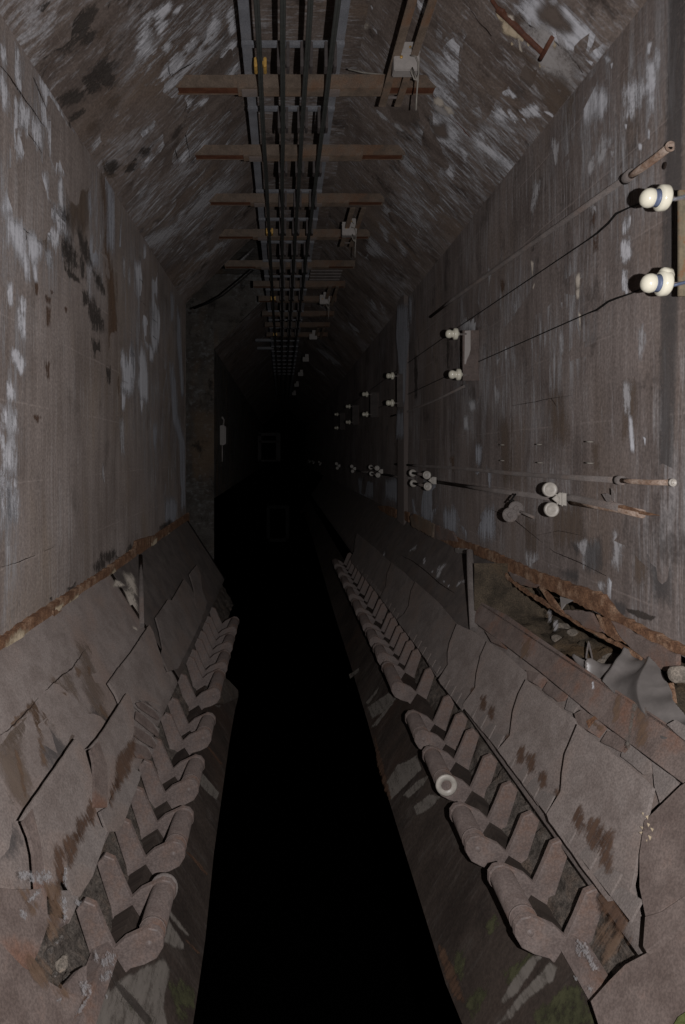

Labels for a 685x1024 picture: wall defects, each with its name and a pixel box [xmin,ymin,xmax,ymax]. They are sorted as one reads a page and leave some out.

damp [514,0,613,69]
damp [354,38,554,258]
damp [574,87,625,195]
damp [0,0,239,530]
damp [0,349,26,564]
rust [0,513,190,650]
rust [378,503,685,703]
spalling [474,563,630,662]
crack [1,649,86,735]
spalling [674,683,685,715]
rust [45,800,96,940]
rust [573,806,613,873]